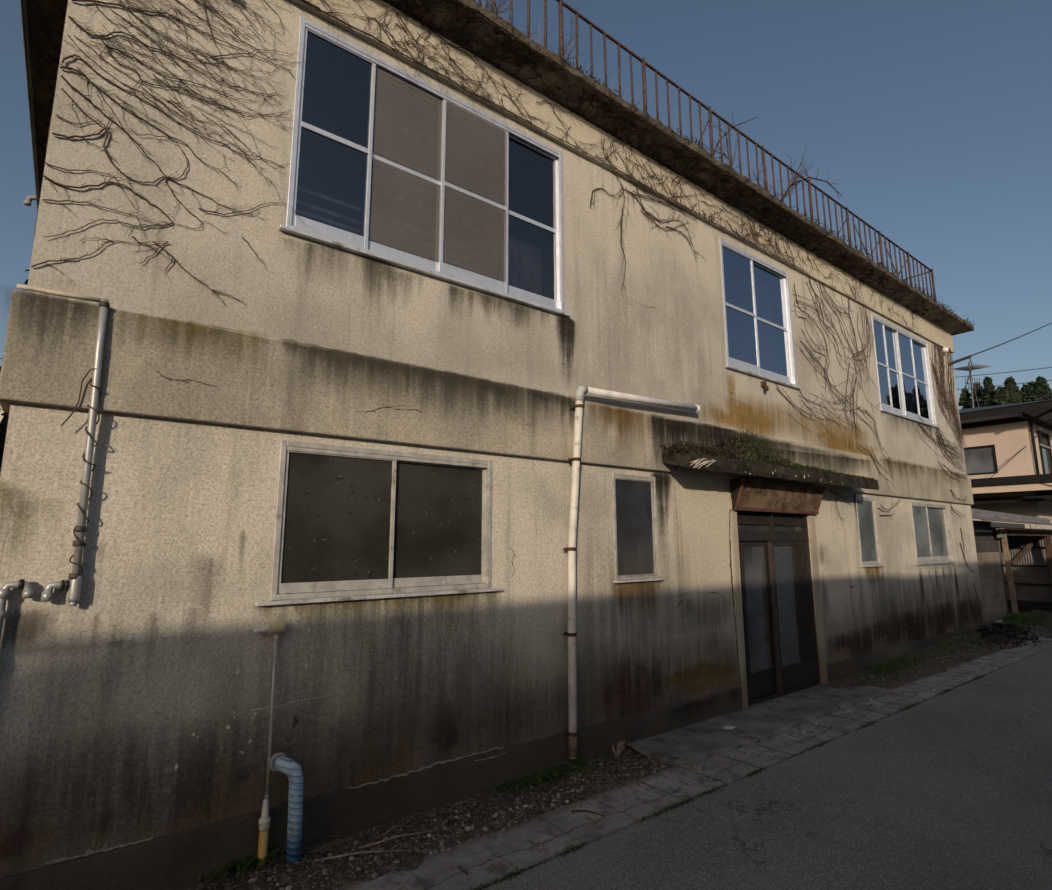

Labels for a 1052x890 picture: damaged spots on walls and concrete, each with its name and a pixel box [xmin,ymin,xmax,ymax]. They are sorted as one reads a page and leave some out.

leakage [367,257,396,278]
leakage [558,316,575,362]
leakage [312,345,575,412]
crack [347,747,505,789]